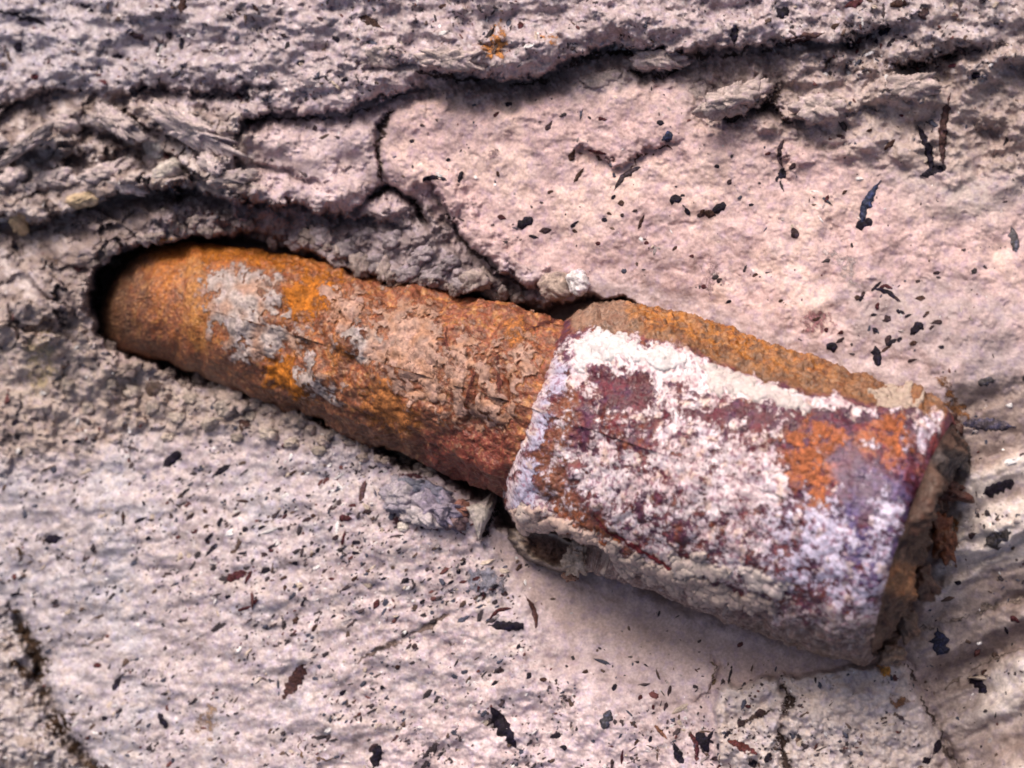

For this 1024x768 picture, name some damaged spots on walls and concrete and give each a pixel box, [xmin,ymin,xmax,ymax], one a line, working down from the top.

crack [892,54,956,70]
crack [4,88,73,112]
crack [129,42,793,291]
rust [192,240,350,326]
rust [261,349,310,410]
spalling [76,215,534,478]
rust [357,369,421,439]
rust [936,376,970,421]
peeling [439,320,945,649]
rust [779,419,845,508]
rust [872,411,916,469]